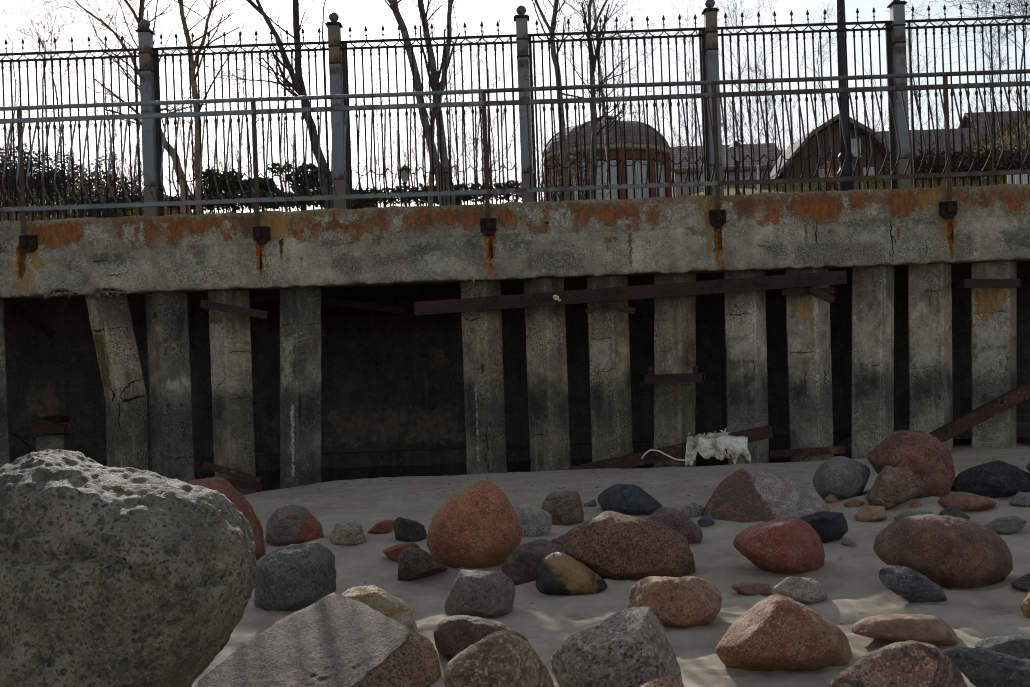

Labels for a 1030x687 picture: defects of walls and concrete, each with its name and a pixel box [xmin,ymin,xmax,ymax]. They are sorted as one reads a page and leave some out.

rust [1,248,45,295]
rust [255,204,513,279]
rust [700,189,928,269]
rust [938,188,1030,259]